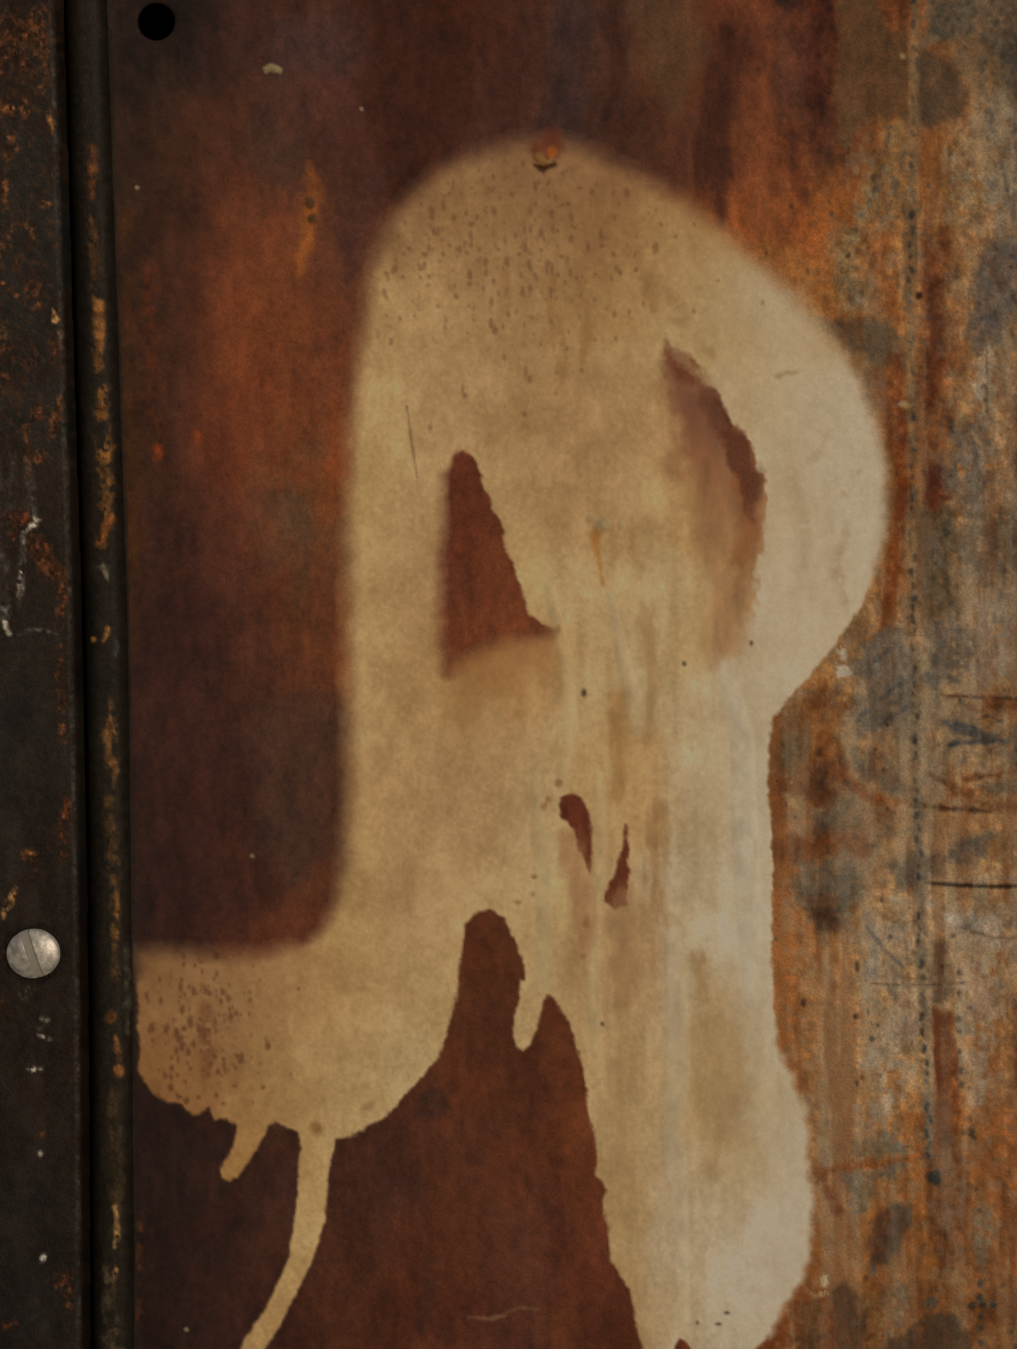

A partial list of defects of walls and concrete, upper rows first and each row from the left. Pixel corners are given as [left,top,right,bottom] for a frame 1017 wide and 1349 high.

rust [680,13,755,224]
rust [82,139,149,665]
rust [448,518,535,650]
rust [661,369,769,609]
rust [858,214,962,641]
rust [770,674,858,808]
rust [593,792,674,1025]
rust [101,1006,147,1325]
rust [533,1024,615,1273]
rust [677,943,759,1194]
rust [931,1007,964,1135]
rust [304,1248,403,1349]